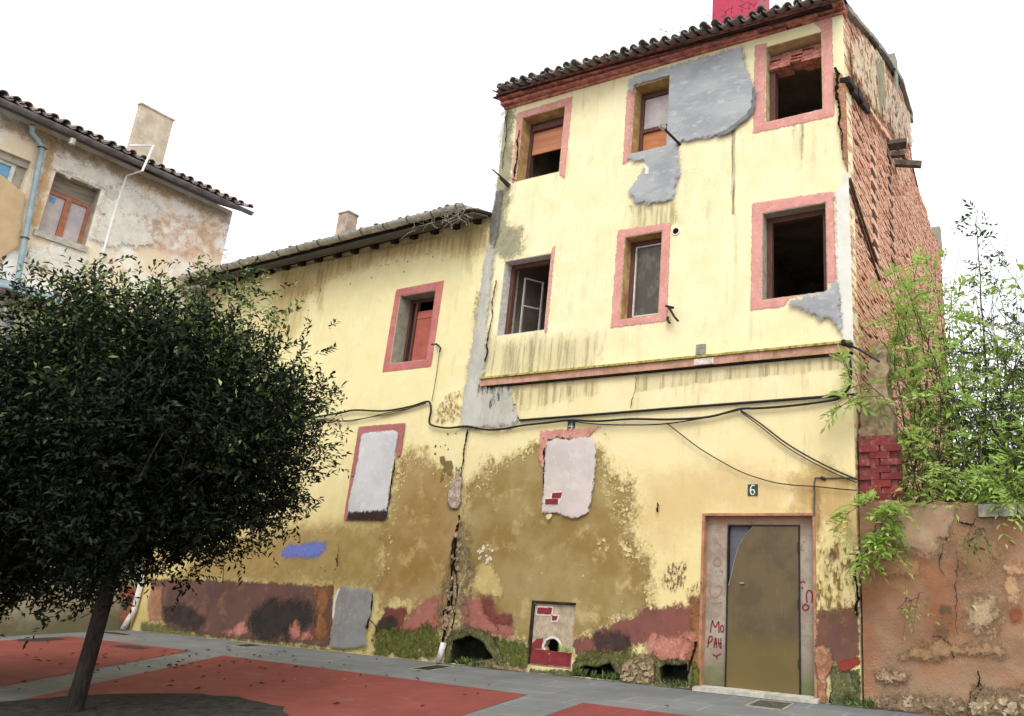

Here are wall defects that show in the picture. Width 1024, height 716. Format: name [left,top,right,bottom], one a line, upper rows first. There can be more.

peeling [26,242,90,280]
peeling [42,140,229,256]
damp [177,439,657,654]
crack [441,515,460,642]
peeling [344,423,702,689]
peeling [814,538,1024,716]
crack [906,499,992,711]